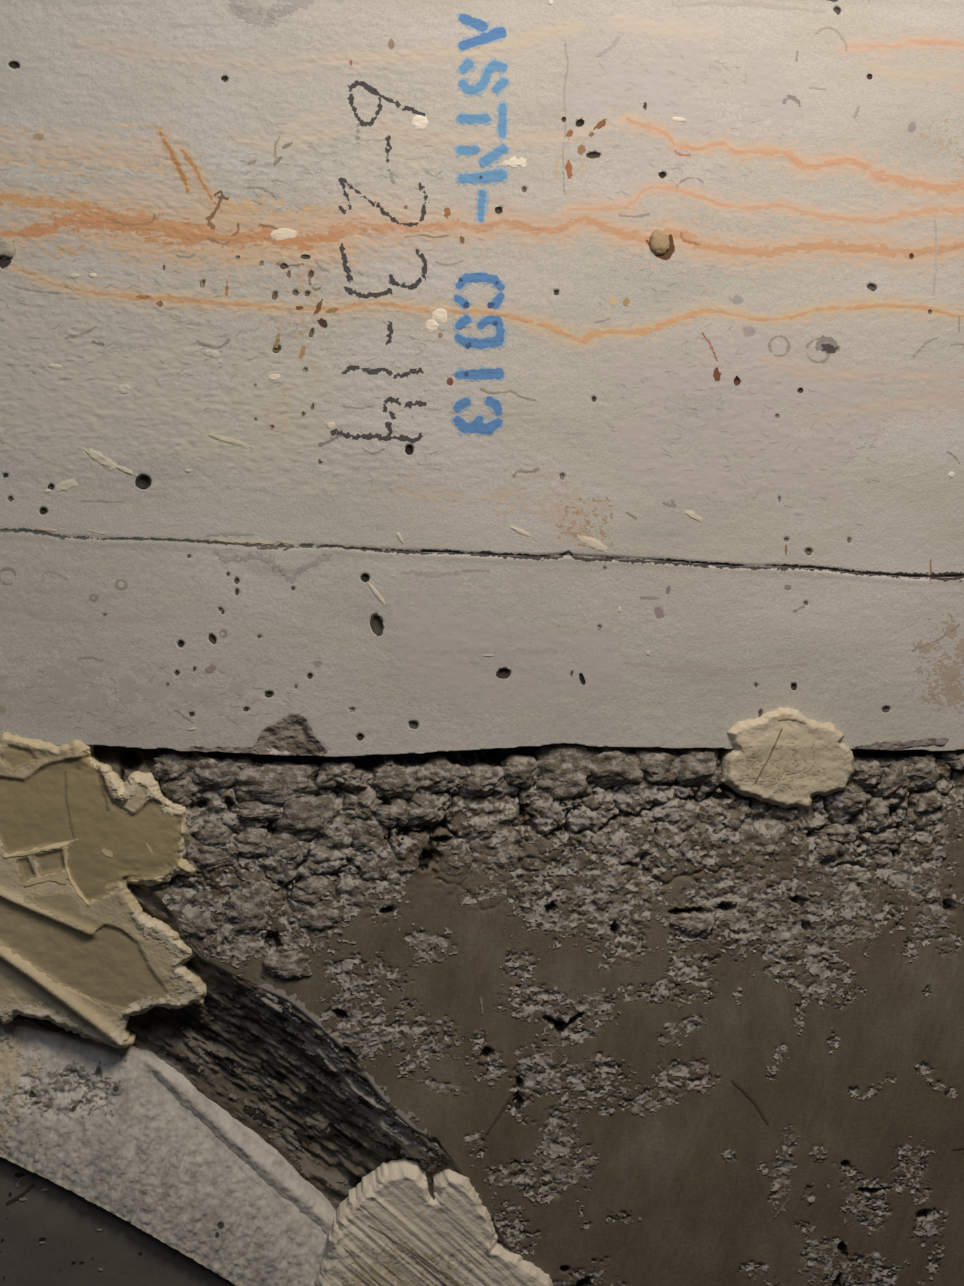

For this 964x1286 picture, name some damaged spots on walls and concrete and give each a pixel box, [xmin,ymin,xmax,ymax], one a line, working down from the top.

crack [562,0,848,218]
crack [0,136,463,470]
corrosion [0,98,964,363]
crack [480,388,537,401]
crack [512,467,539,478]
crack [595,232,889,519]
crack [913,315,964,357]
crack [0,527,964,583]
flaking render [149,713,964,1257]
spalling [552,1257,629,1286]
spalling [738,1261,783,1286]
spalling [757,1126,949,1286]